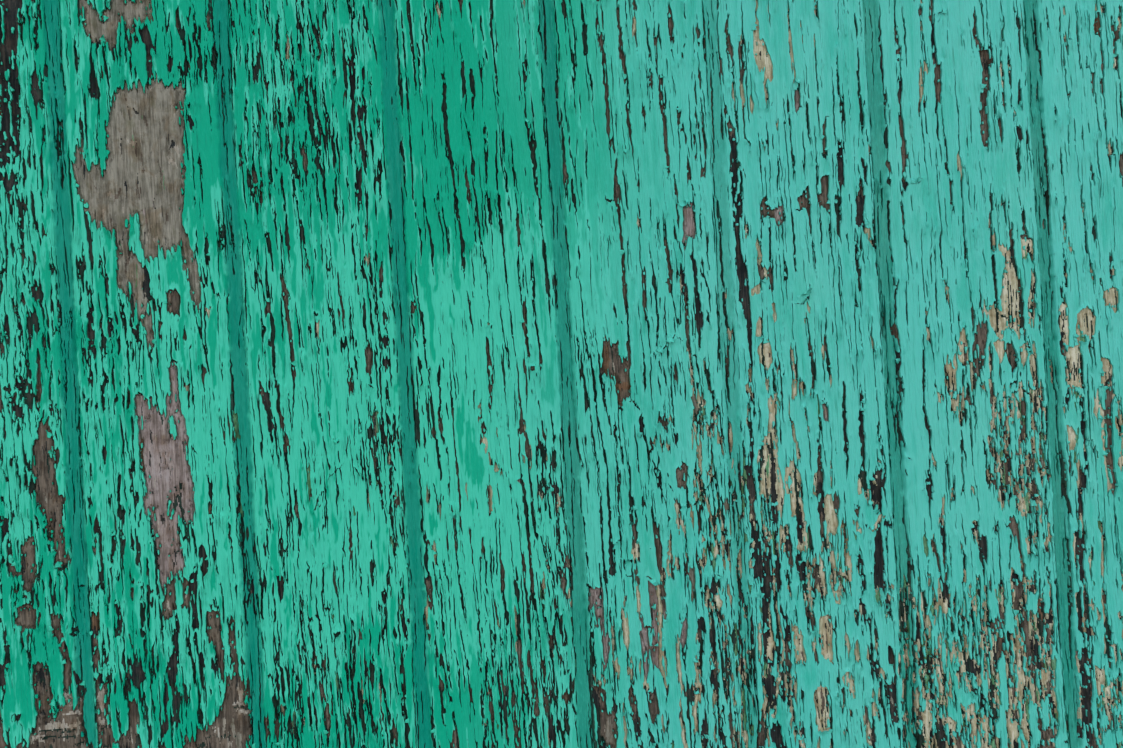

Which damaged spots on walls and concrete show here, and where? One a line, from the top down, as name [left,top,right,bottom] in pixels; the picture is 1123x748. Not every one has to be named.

peeling [0,5,20,237]
peeling [72,0,206,353]
peeling [678,199,696,251]
peeling [731,11,773,113]
peeling [745,166,840,270]
peeling [597,336,634,440]
peeling [134,360,210,638]
peeling [559,507,568,562]
peeling [586,406,733,748]
peeling [714,221,1123,748]
peeling [180,599,255,748]
peeling [450,725,460,748]